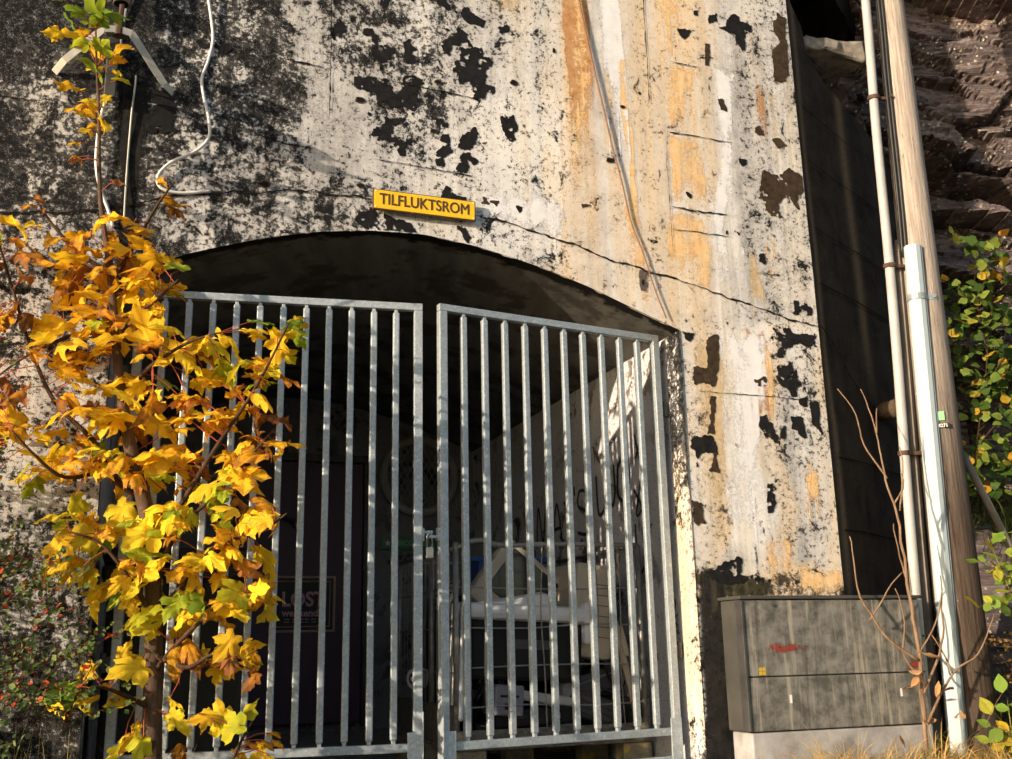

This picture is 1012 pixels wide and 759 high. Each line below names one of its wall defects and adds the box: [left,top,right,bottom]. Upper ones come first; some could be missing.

leakage [112,80,146,266]
peeling [354,28,424,156]
peeling [434,118,479,173]
peeling [436,0,495,101]
peeling [500,115,518,142]
corrosion [562,0,593,168]
peeling [758,168,804,218]
crack [477,213,898,433]
peeling [793,300,813,316]
peeling [690,334,720,473]
peeling [754,326,823,442]
peeling [767,483,777,513]